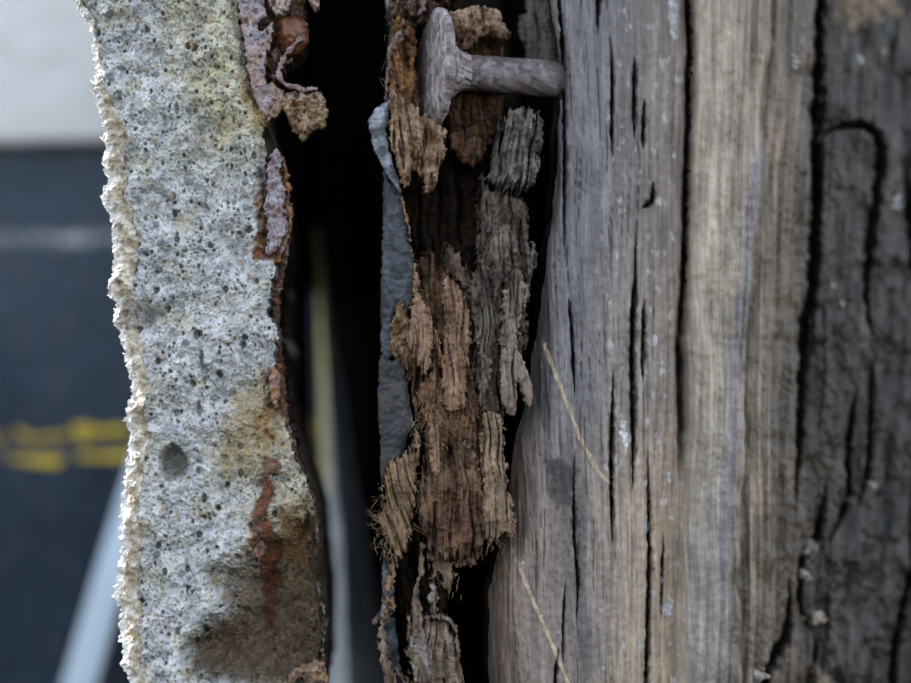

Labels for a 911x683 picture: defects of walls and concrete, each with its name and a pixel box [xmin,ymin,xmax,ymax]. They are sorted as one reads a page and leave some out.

rust [268,0,291,18]
rust [242,75,329,142]
peeling [384,0,449,122]
peeling [444,90,506,169]
rust [252,148,294,264]
crack [676,0,695,404]
rust [211,367,315,632]
peeling [406,193,538,615]
crack [567,302,575,397]
crack [609,232,664,683]
crack [761,0,886,683]
peeling [377,550,399,683]